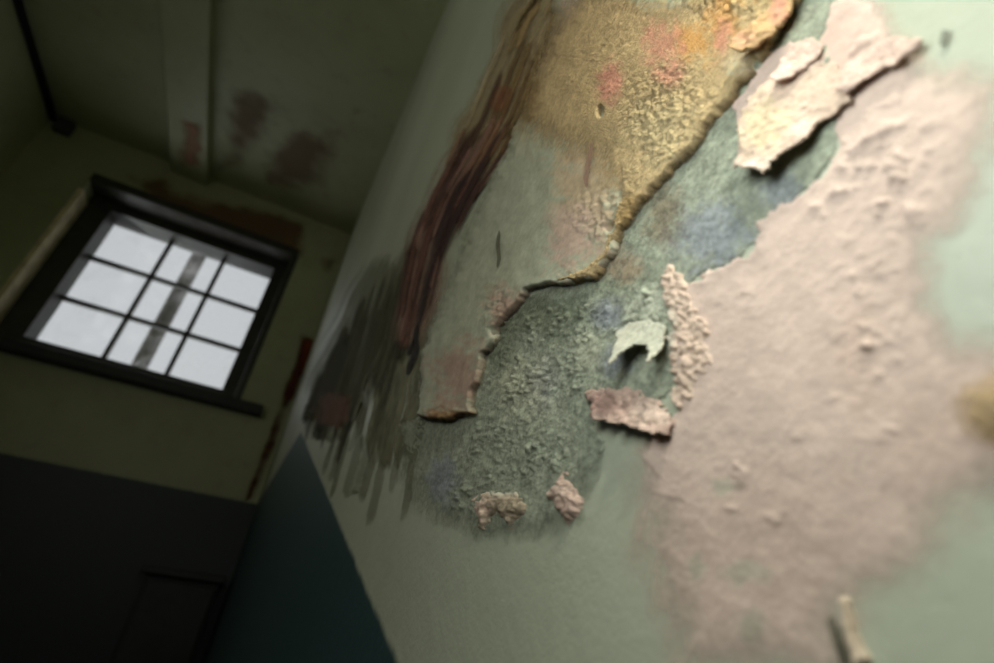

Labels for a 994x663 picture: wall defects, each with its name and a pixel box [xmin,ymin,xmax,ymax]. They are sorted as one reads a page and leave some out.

flaking render [416,102,625,422]
flaking render [585,0,994,663]
peeling [471,491,527,530]
peeling [546,471,585,524]